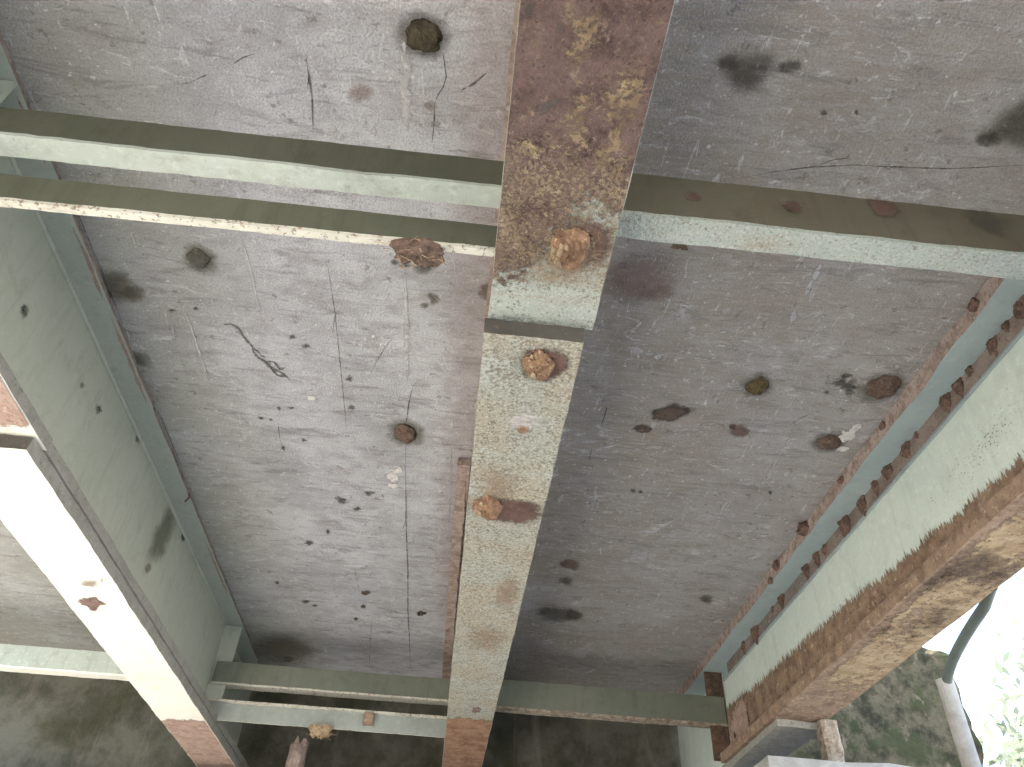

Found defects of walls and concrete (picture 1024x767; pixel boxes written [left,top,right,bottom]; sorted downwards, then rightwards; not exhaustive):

water stain [720,57,769,88]
water stain [781,62,799,72]
crack [432,54,487,139]
water stain [978,106,1024,145]
rust [479,0,674,302]
crack [720,158,1018,183]
water stain [153,518,185,554]
rust [727,315,1024,743]
peeling [78,580,106,611]
water stain [541,608,580,625]